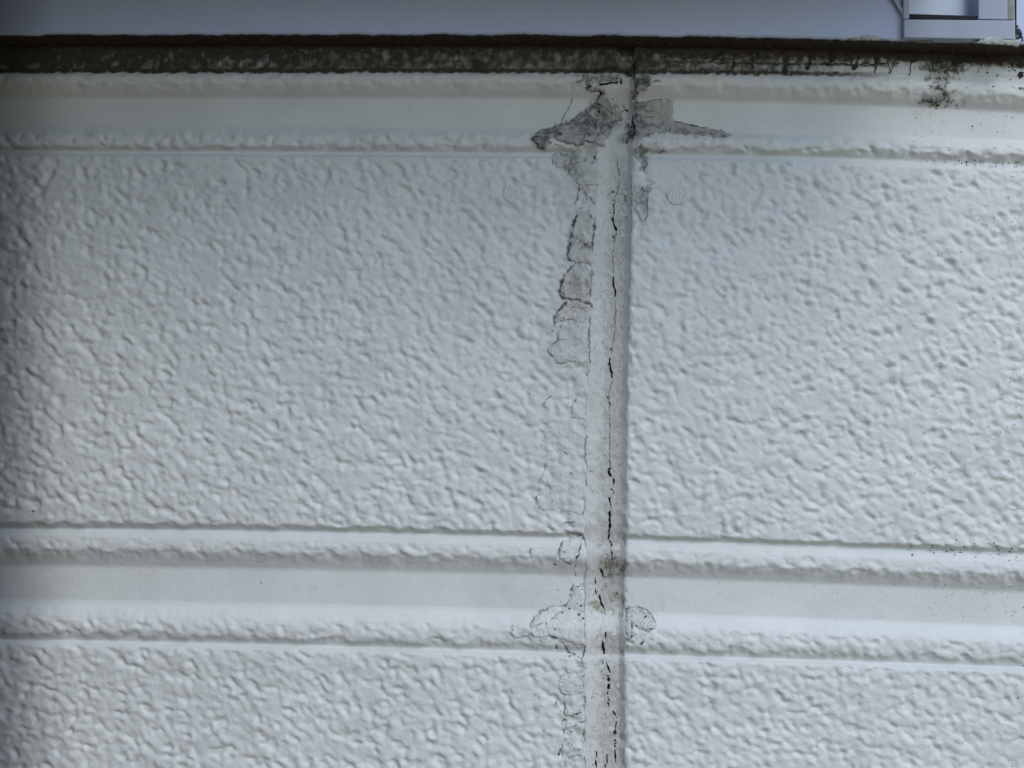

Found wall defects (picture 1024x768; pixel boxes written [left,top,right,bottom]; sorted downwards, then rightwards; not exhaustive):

water stain [0,25,1024,177]
peeling [537,397,589,515]
crack [595,165,620,768]
peeling [557,665,587,768]